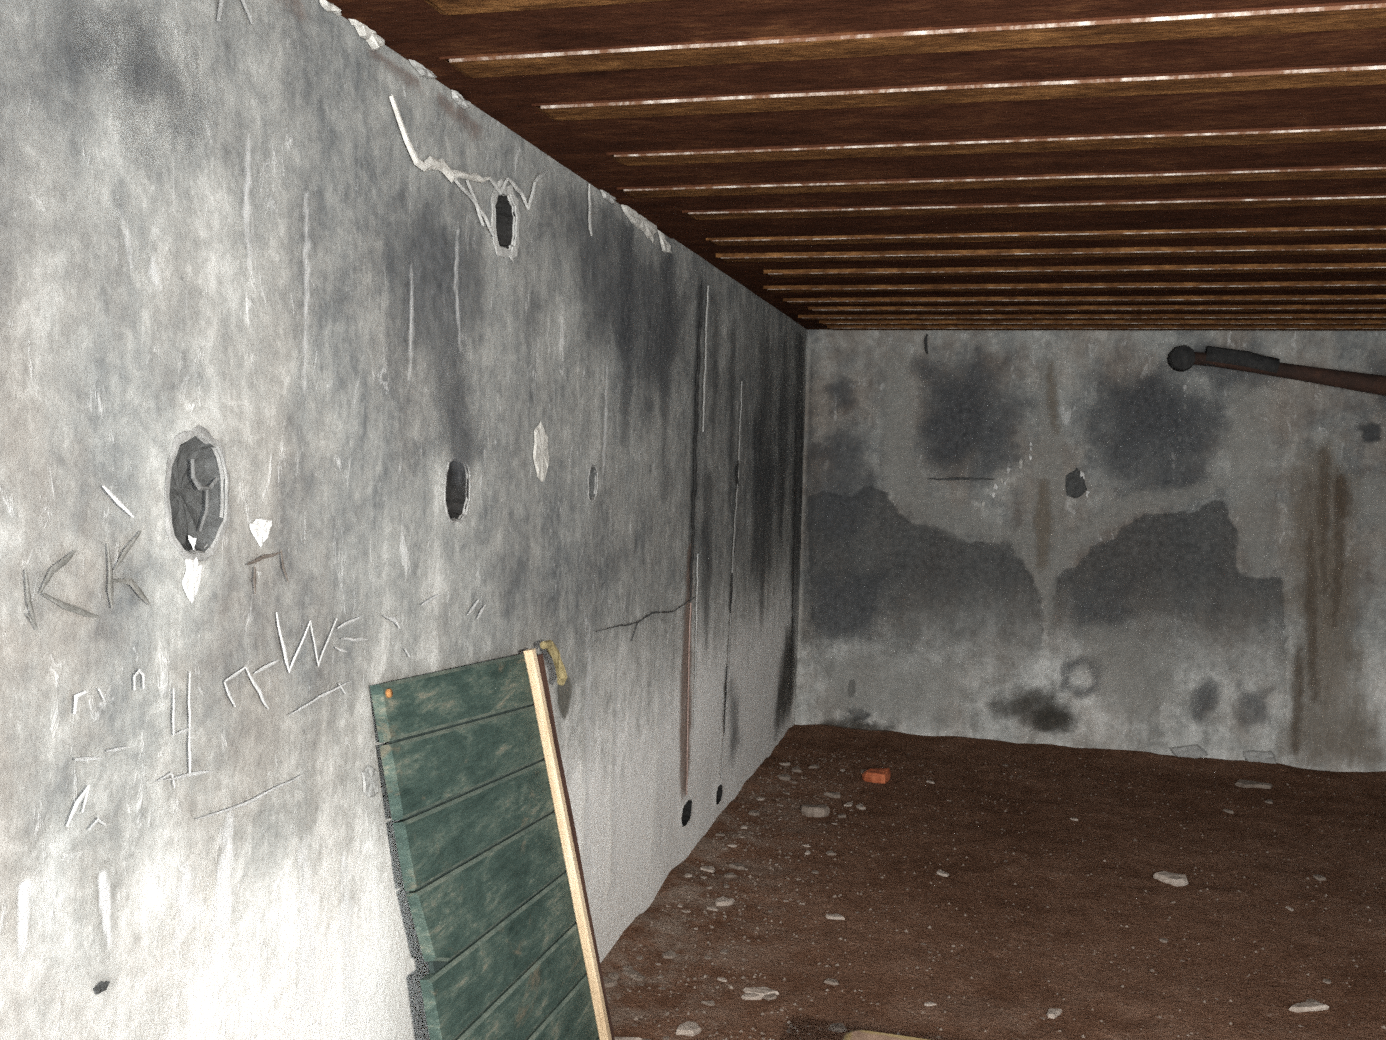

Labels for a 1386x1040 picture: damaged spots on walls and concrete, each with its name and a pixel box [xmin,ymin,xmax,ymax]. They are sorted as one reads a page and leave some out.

crack [389,94,547,237]
spalling [164,425,231,603]
spalling [533,421,549,482]
damp [776,634,795,727]